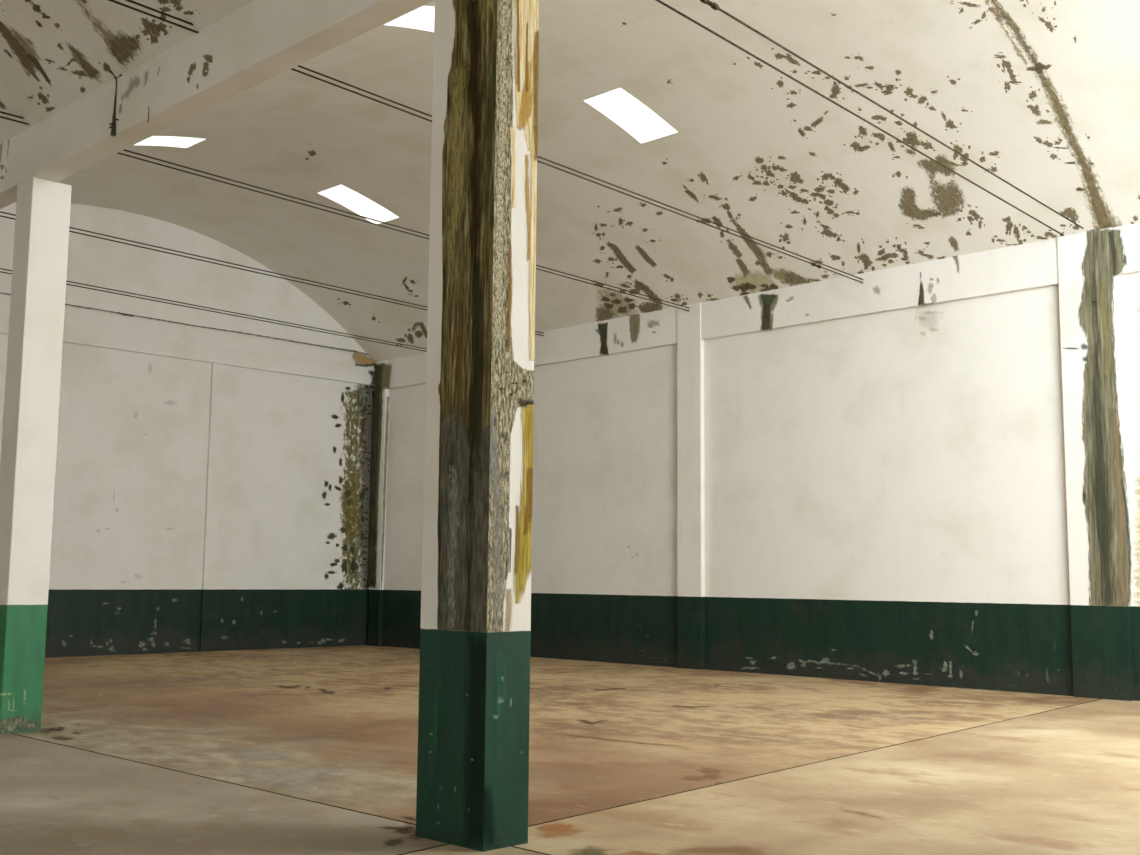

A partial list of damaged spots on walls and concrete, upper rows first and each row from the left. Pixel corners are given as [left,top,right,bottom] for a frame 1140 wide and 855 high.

peeling [135,0,200,45]
peeling [950,1,988,29]
peeling [1020,0,1057,32]
peeling [771,48,1002,178]
peeling [994,52,1062,160]
damp [595,292,662,355]
peeling [592,206,719,306]
damp [683,185,819,330]
peeling [733,156,946,282]
peeling [933,204,1080,246]
damp [986,0,1140,606]
damp [437,0,534,845]